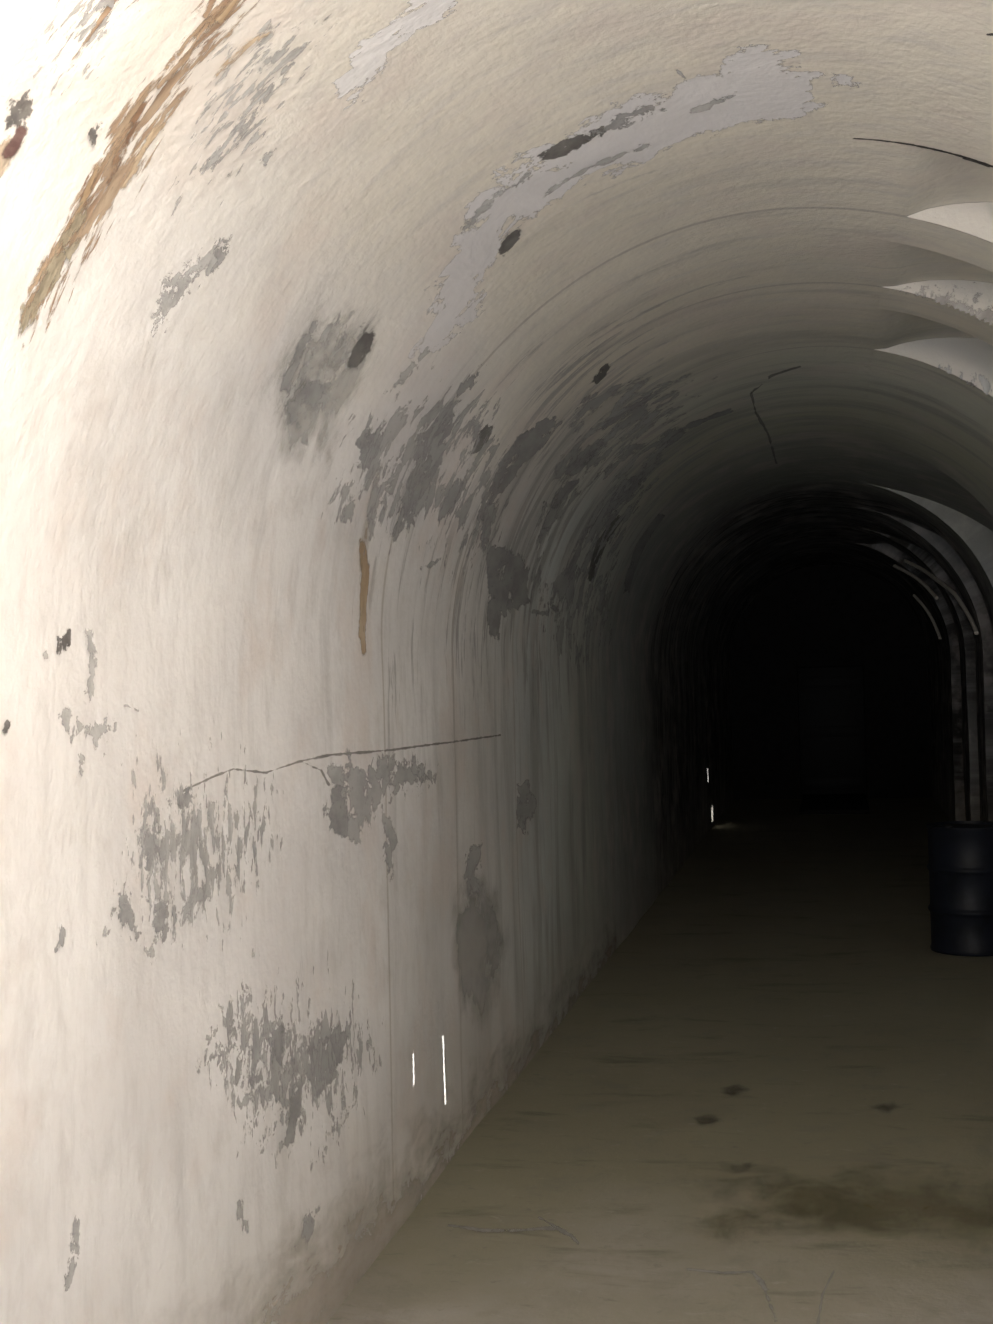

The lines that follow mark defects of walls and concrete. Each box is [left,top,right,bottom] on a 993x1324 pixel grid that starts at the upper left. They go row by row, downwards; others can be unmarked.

corrosion [0,89,33,177]
peeling [33,0,136,94]
corrosion [18,0,270,346]
peeling [190,15,332,184]
peeling [333,0,457,110]
crack [853,138,993,168]
peeling [281,44,860,640]
corrosion [359,539,369,654]
peeling [96,748,282,958]
crack [183,734,501,792]
peeling [323,750,436,878]
peeling [198,957,381,1170]